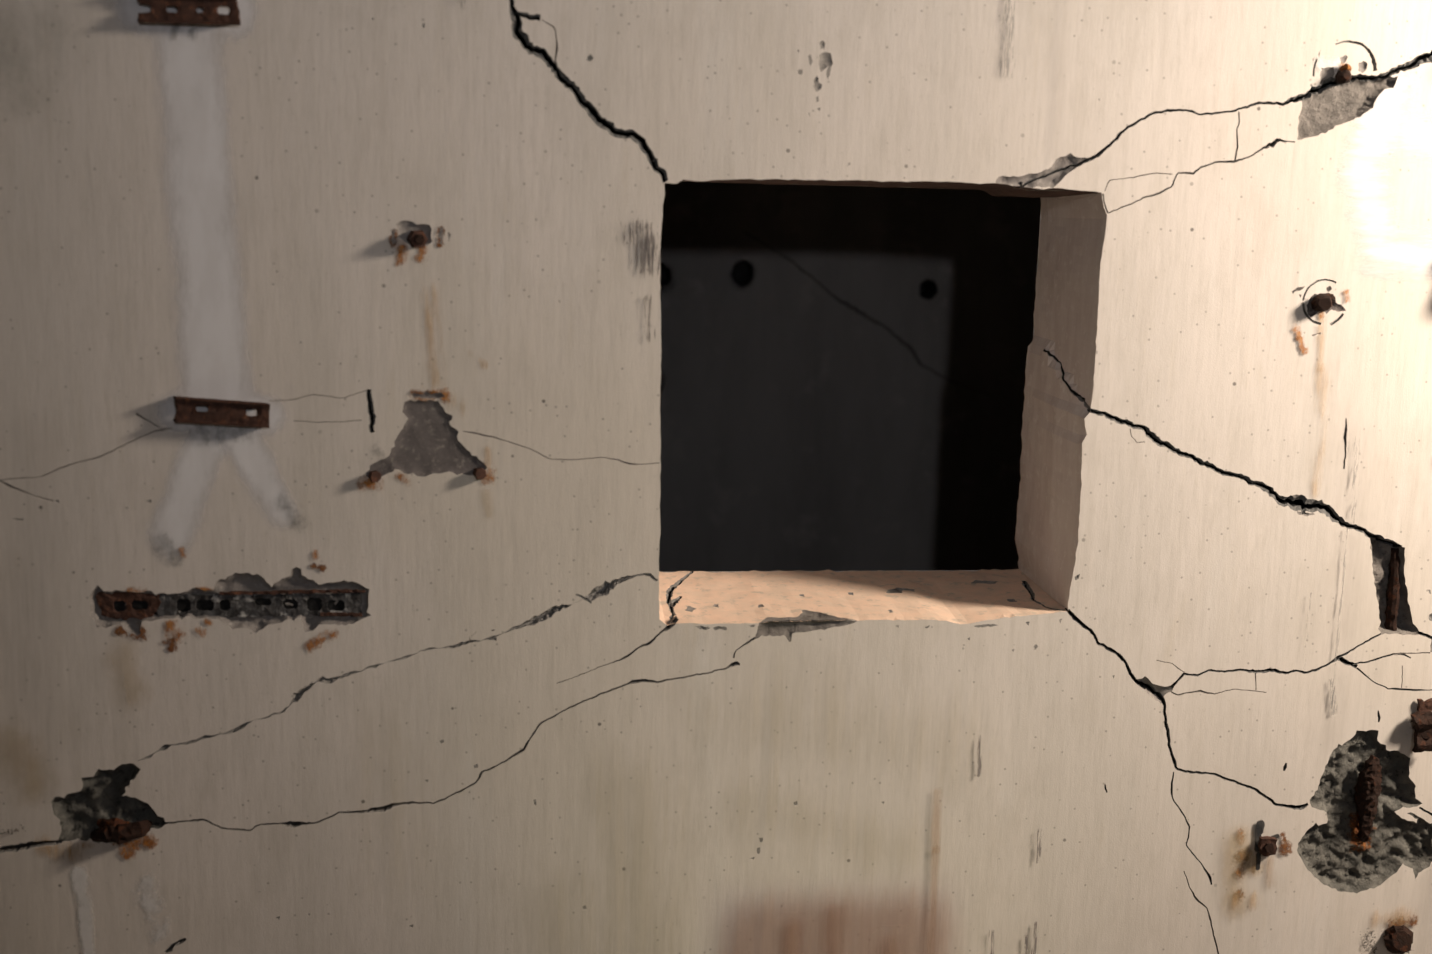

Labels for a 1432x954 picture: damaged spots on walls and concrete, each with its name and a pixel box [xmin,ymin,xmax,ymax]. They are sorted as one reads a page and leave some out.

crack [509,0,686,183]
crack [1011,50,1432,213]
damp [121,0,294,555]
peeling [366,389,487,478]
crack [463,431,659,465]
spalling [89,567,371,636]
spalling [1367,536,1432,652]
crack [0,839,63,853]
spalling [52,763,165,843]
crack [137,571,755,831]
crack [1022,581,1432,954]
spalling [1297,711,1432,893]